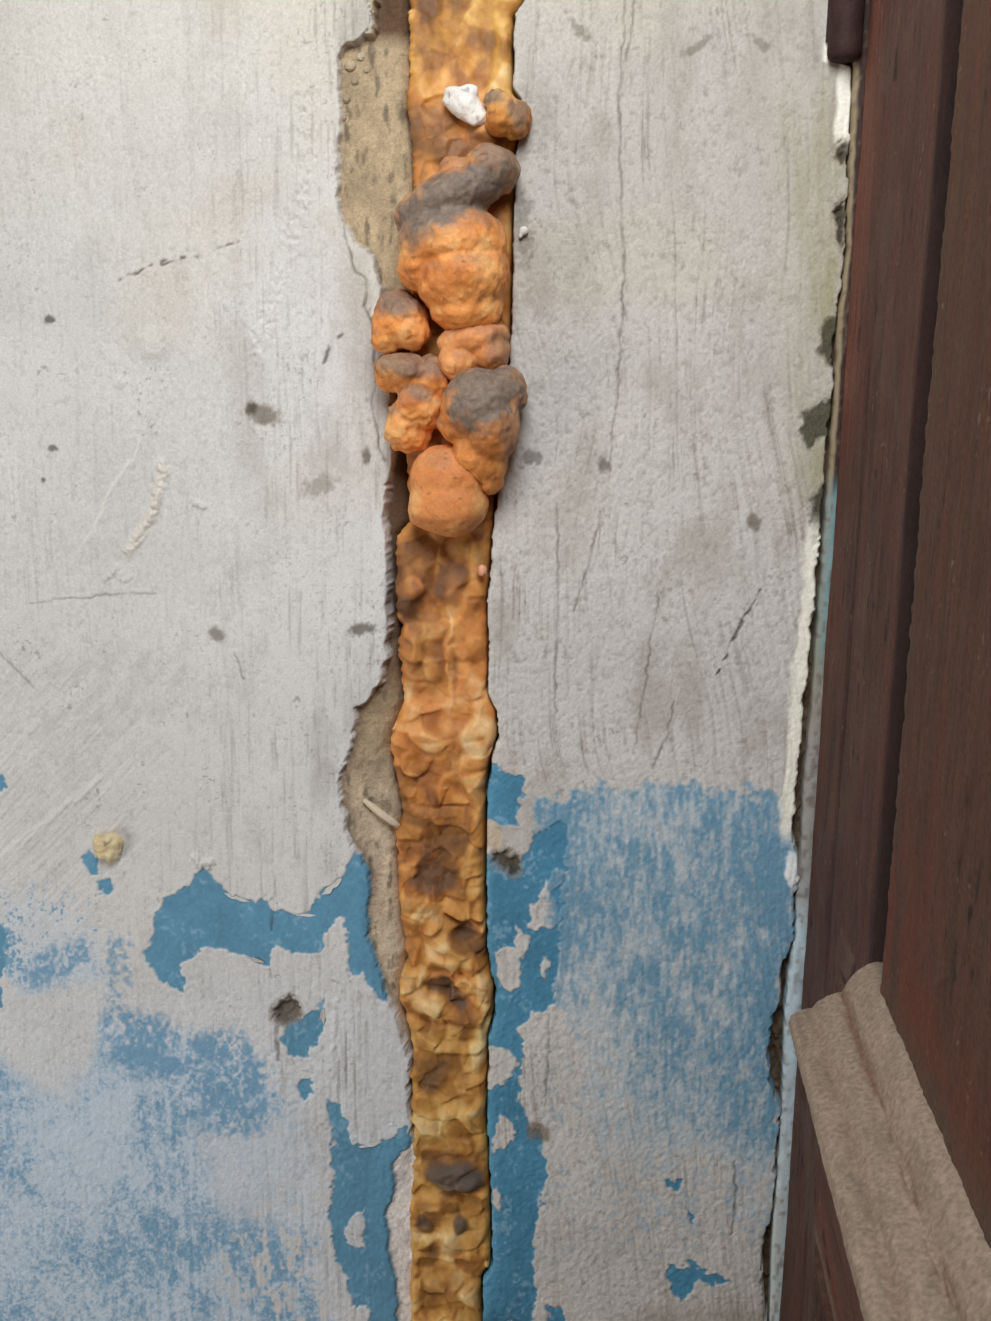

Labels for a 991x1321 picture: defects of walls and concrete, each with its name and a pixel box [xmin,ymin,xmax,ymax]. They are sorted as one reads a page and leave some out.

spalling [334,0,414,296]
peeling [0,769,12,797]
peeling [75,844,120,901]
peeling [138,445,416,1321]
peeling [0,918,15,1011]
peeling [483,760,575,1321]
peeling [662,1174,698,1233]
peeling [662,1256,735,1296]